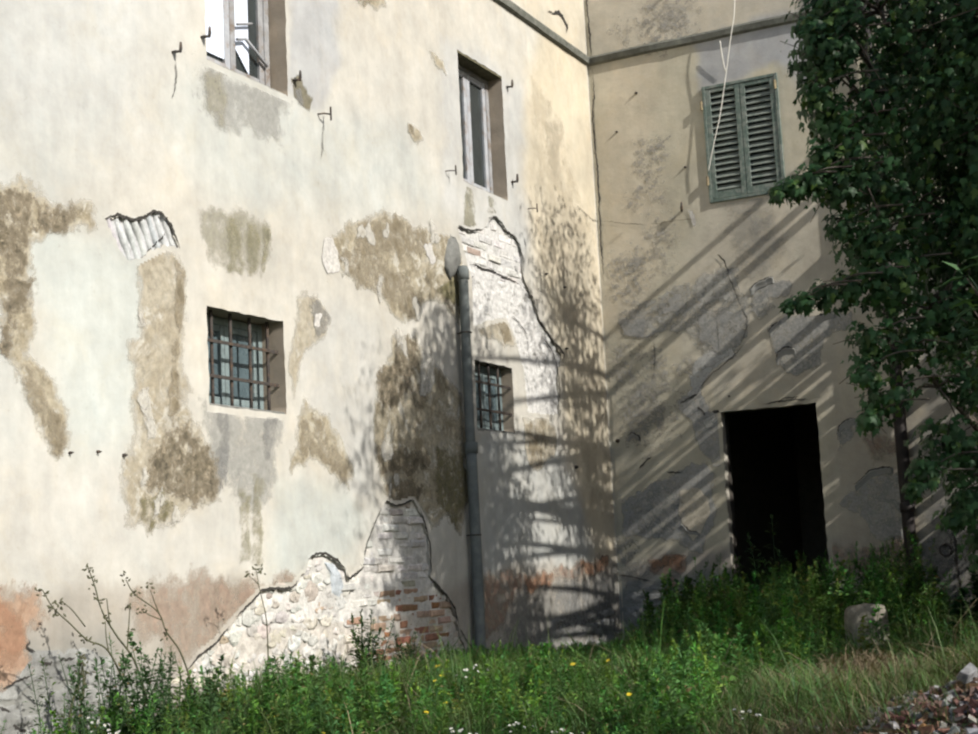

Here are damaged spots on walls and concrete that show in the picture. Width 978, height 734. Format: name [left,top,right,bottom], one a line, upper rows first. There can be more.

leakage [0,174,96,458]
flaking render [102,206,181,266]
leakage [122,252,283,564]
leakage [288,295,331,389]
leakage [290,399,354,490]
leakage [322,211,468,535]
flaking render [456,212,565,420]
crack [549,0,688,277]
peeling [542,135,857,647]
crack [680,254,748,416]
flaking render [0,647,122,734]
flaking render [171,496,472,694]